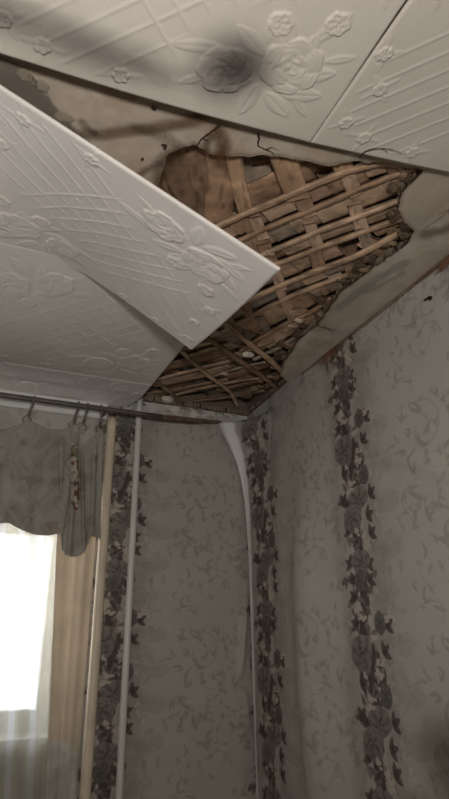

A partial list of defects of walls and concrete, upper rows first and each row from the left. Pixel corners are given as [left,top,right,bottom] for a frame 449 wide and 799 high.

water stain [77,116,202,137]